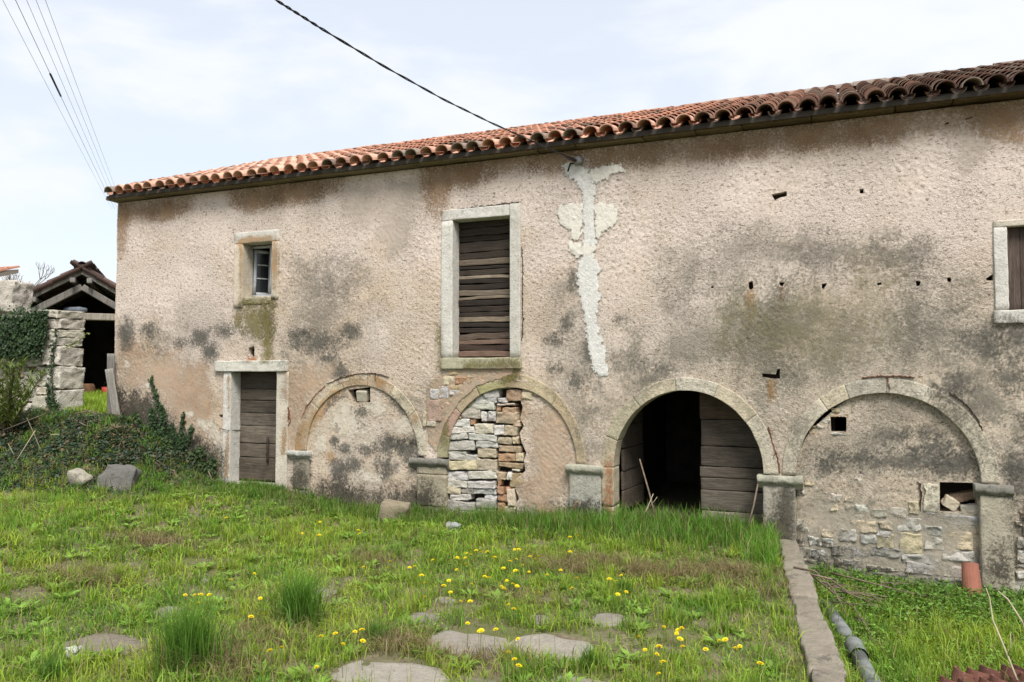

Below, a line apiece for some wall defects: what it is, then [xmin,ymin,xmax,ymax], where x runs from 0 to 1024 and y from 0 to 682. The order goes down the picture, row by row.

peeling [557,162,626,259]
damp [117,317,160,351]
damp [173,304,361,378]
spalling [313,367,525,455]
spalling [808,408,849,436]
crack [950,393,983,430]
damp [290,423,446,513]
peeling [356,468,383,484]
spalling [796,469,981,588]
flaking render [1015,511,1024,595]